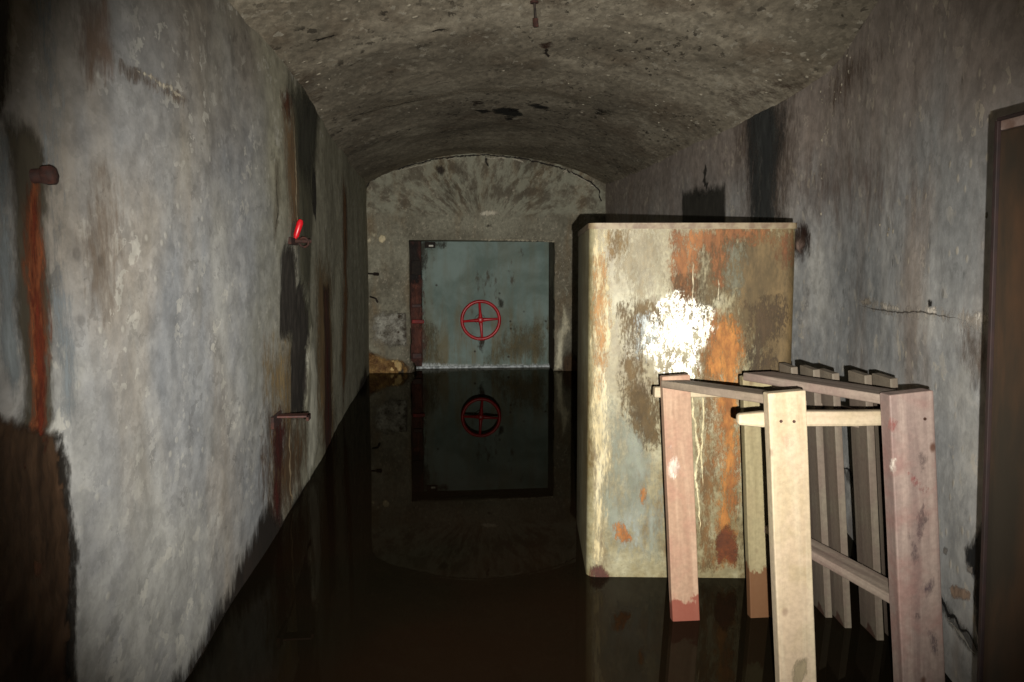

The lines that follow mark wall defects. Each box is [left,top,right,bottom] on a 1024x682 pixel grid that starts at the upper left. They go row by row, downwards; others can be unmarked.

damp [742,106,789,223]
peeling [624,290,714,381]
crack [863,306,955,318]
corrosion [592,229,795,575]
corrosion [262,405,307,527]